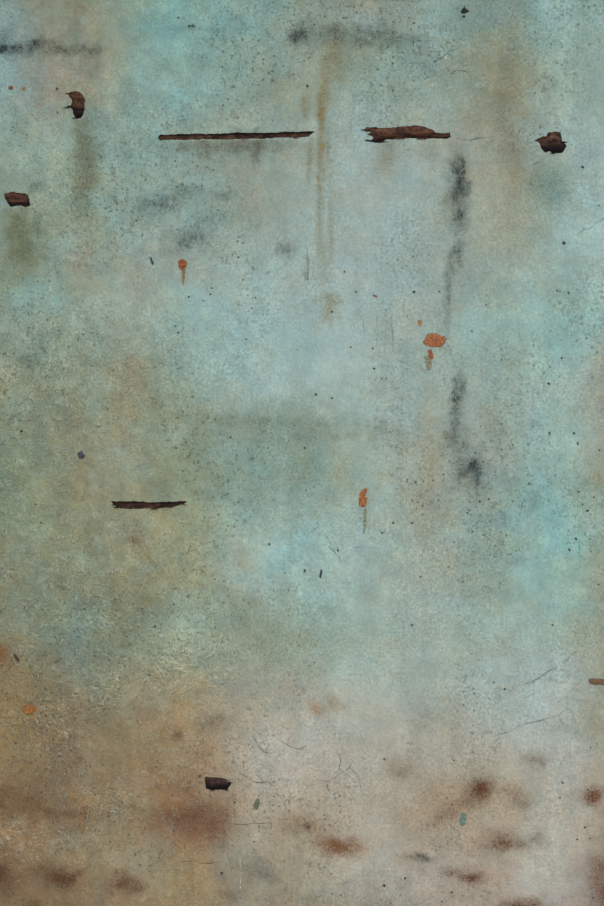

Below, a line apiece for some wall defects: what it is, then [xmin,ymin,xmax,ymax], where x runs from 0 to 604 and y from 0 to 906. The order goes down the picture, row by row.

flaking render [56,87,85,119]
flaking render [362,125,451,143]
flaking render [535,132,566,154]
damp [452,159,470,200]
flaking render [4,191,30,207]
rust [178,259,187,285]
rust [423,333,446,370]
rust [359,488,367,533]
flaking render [199,775,233,791]